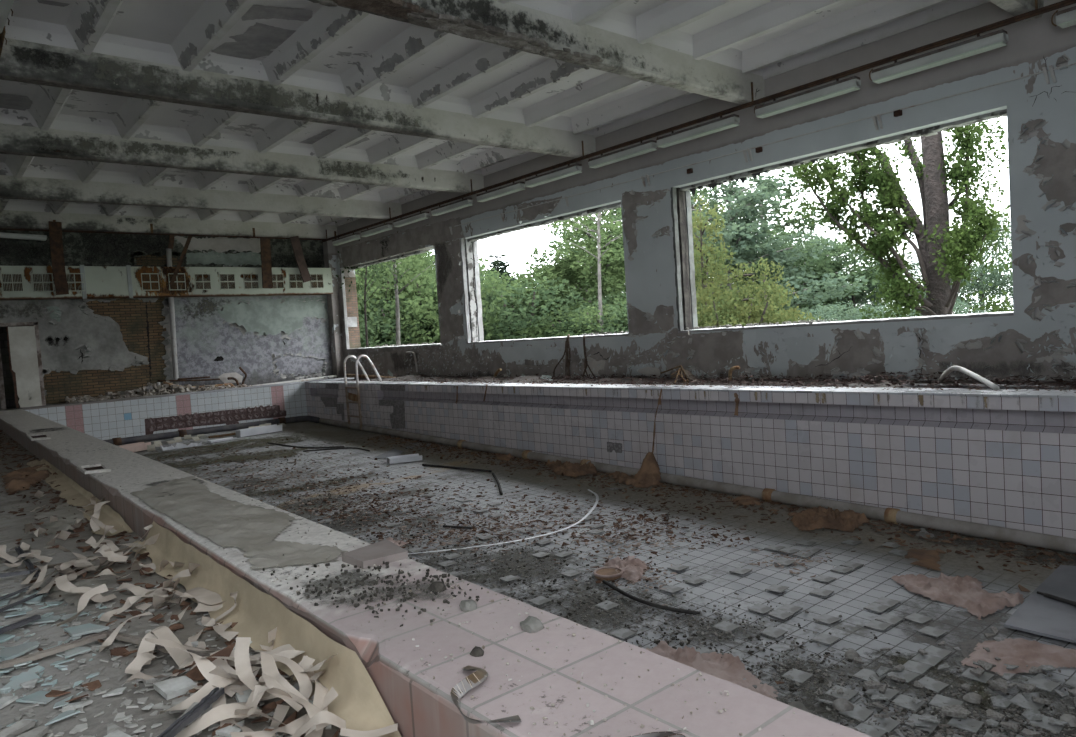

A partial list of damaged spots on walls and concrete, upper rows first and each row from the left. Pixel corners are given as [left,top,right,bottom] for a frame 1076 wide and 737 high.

leakage [12,46,75,71]
peeling [75,0,107,52]
peeling [178,0,239,69]
leakage [212,4,313,59]
mould [409,0,656,70]
leakage [0,93,32,111]
mould [38,134,236,160]
peeling [622,189,670,261]
peeling [1012,119,1076,322]
flaking render [42,298,172,404]
peeling [215,297,344,420]
peeling [783,321,1076,381]